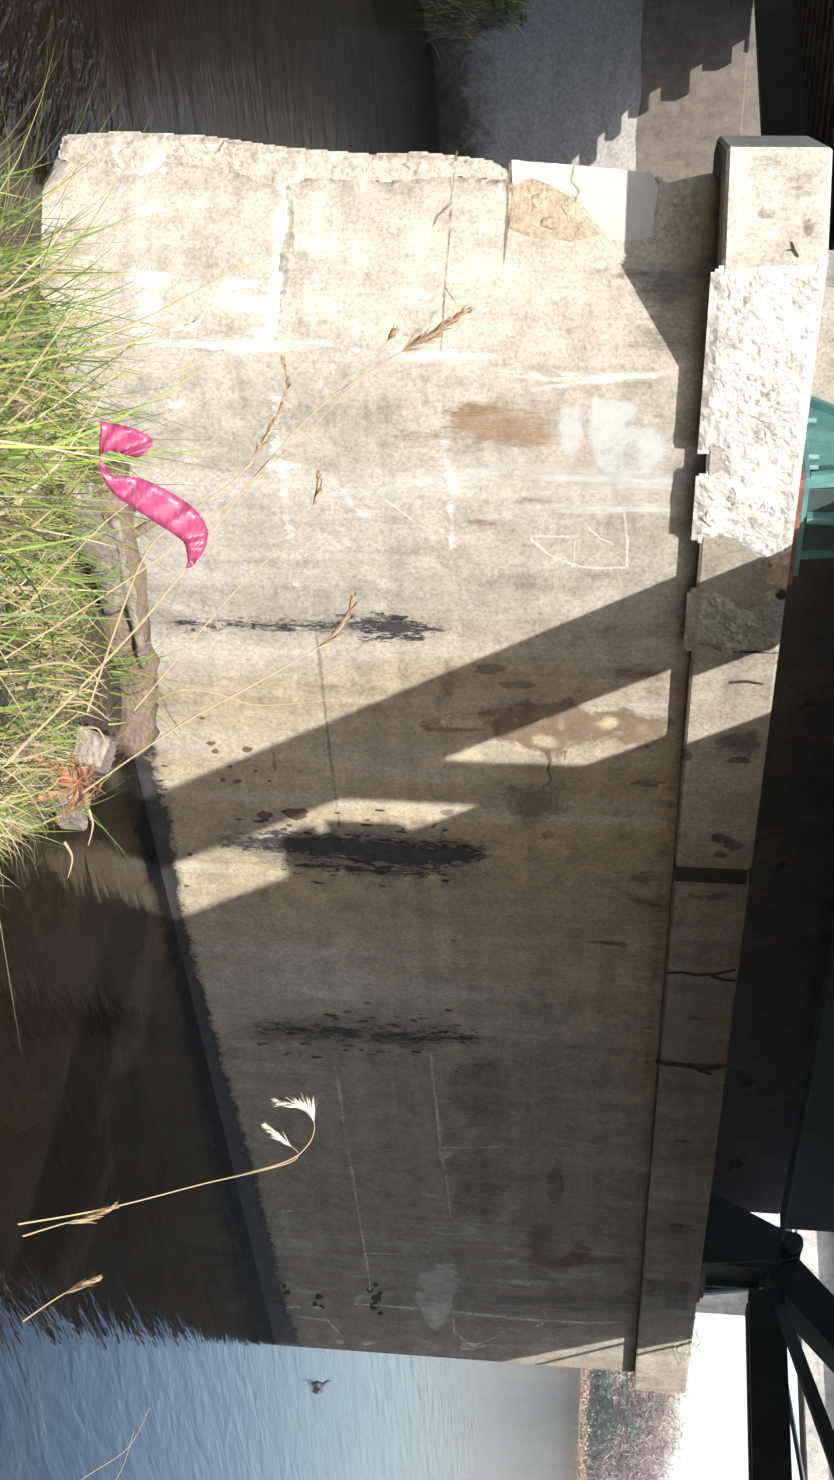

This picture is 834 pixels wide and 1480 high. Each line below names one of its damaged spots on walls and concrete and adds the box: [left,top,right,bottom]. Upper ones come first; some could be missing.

spalling [58,131,599,325]
water stain [127,271,281,351]
corrosion [454,404,551,445]
spalling [654,173,827,656]
water stain [165,610,449,642]
water stain [219,809,491,887]
crack [666,969,736,982]
water stain [257,1002,479,1059]
crack [655,1059,722,1075]